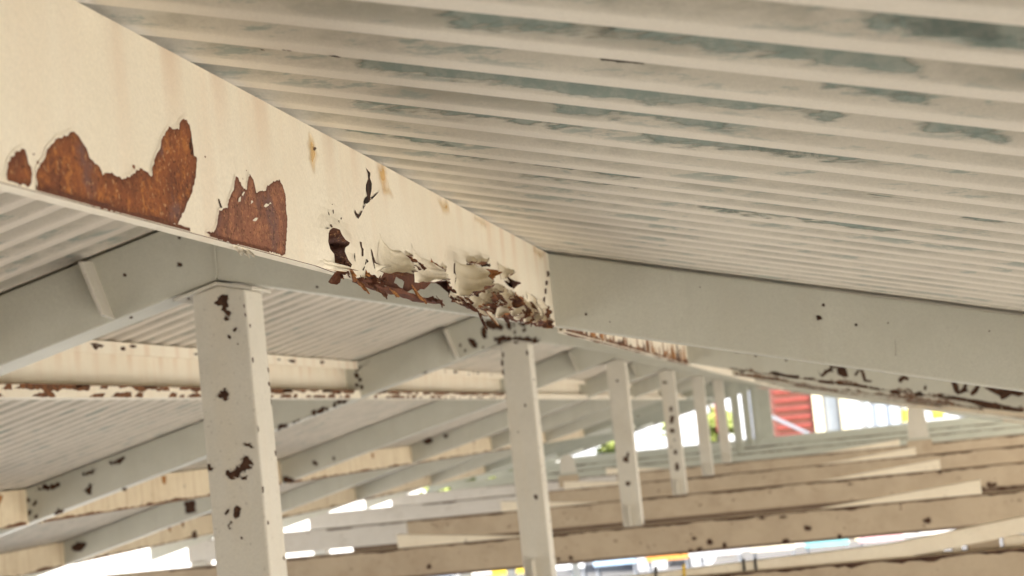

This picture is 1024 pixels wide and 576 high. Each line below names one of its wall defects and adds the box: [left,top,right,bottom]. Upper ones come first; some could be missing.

rust [5,116,206,239]
rust [205,170,288,257]
peeling [324,235,554,330]